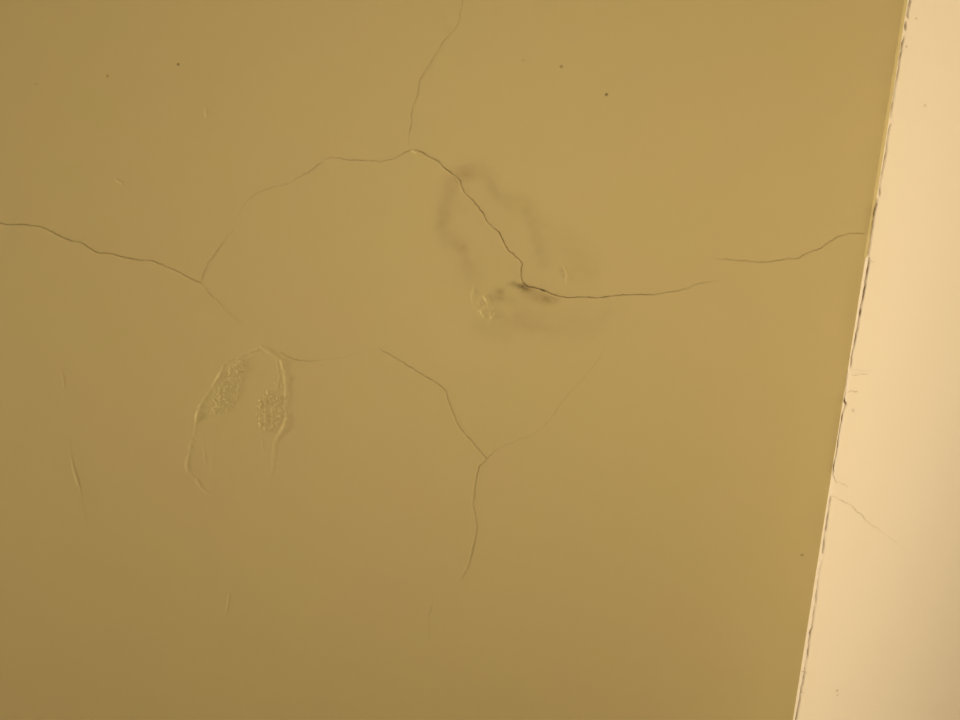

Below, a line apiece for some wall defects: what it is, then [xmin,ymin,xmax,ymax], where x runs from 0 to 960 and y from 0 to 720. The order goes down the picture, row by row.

crack [850,257,869,365]